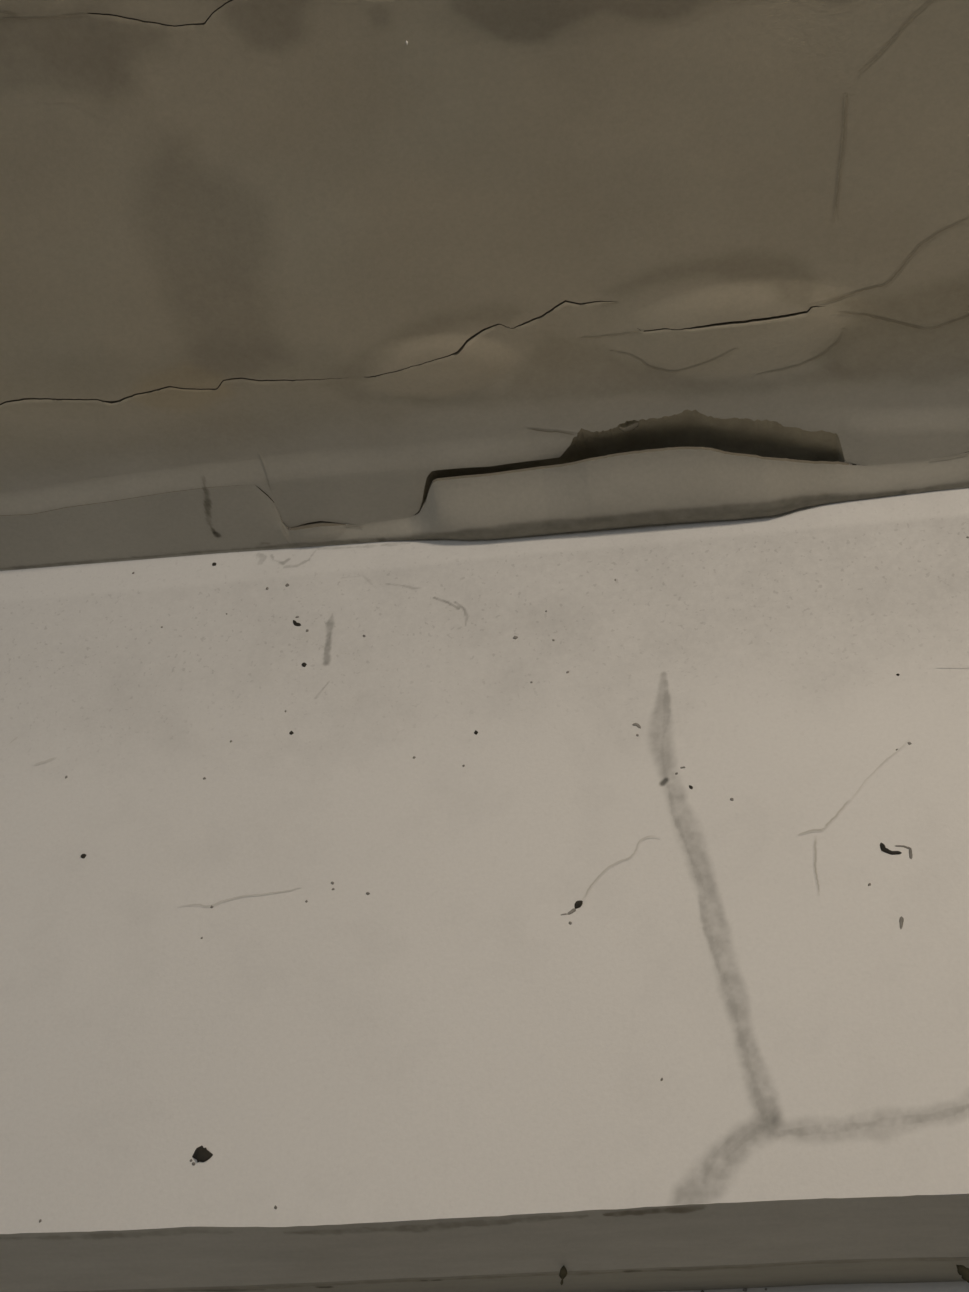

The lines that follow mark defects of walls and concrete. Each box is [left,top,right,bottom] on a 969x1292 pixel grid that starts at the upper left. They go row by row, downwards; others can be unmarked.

water stain [0,0,190,122]
crack [0,0,233,27]
water stain [199,0,399,66]
water stain [440,0,761,52]
crack [834,0,933,219]
crack [0,218,969,405]
water stain [0,119,969,571]
peeling [415,409,856,530]
crack [581,670,969,1205]